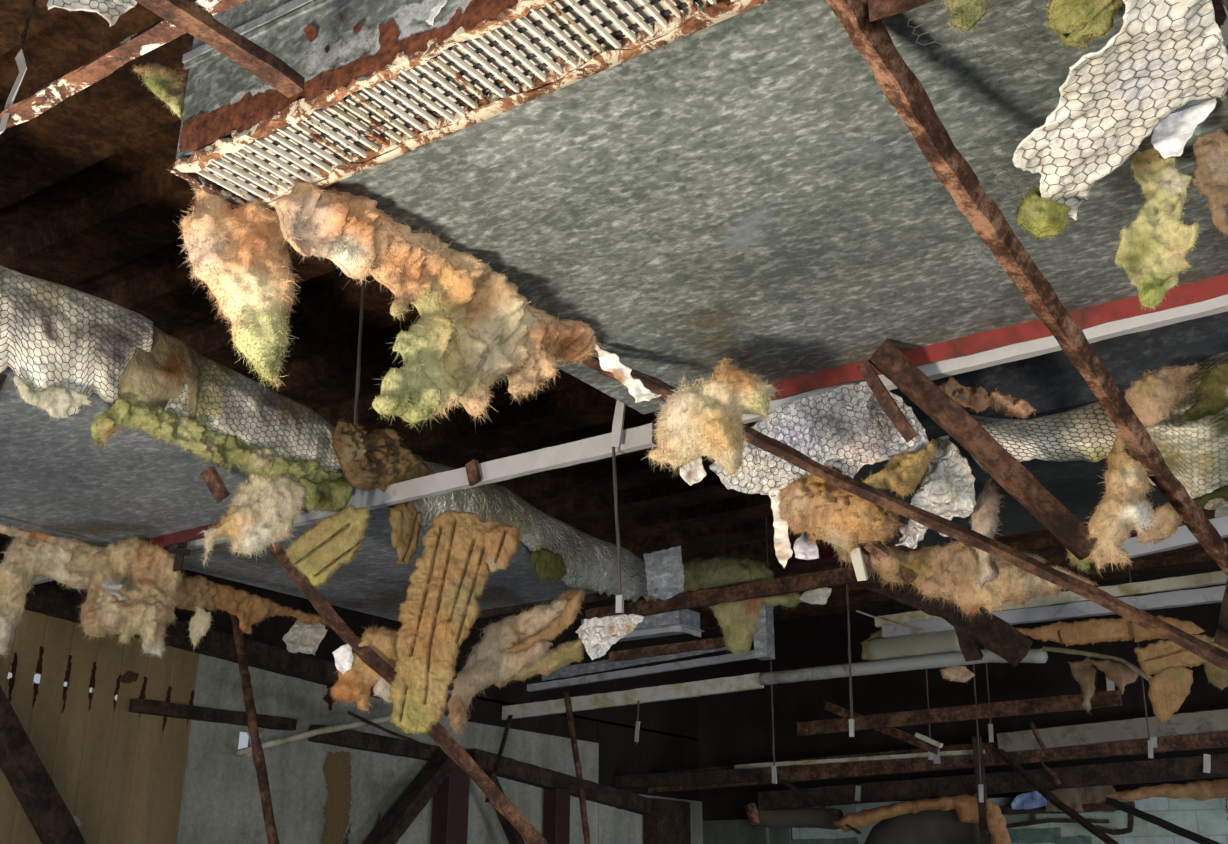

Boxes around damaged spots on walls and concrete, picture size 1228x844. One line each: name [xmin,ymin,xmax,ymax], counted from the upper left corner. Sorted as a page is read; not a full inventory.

corrosion [179,0,518,152]
peeling [394,0,448,26]
corrosion [298,0,771,189]